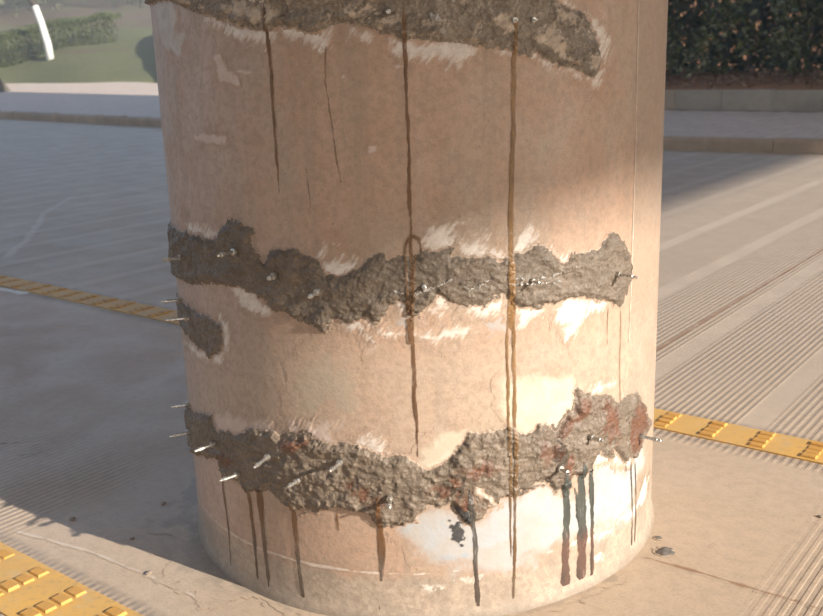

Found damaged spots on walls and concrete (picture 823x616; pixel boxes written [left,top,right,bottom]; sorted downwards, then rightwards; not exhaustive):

peeling [219,0,287,31]
peeling [317,0,385,30]
peeling [406,23,482,48]
peeling [486,0,601,77]
corrosion [262,3,280,192]
corrosion [402,8,422,457]
corrosion [506,13,519,599]
corrosion [243,487,270,587]
corrosion [288,500,305,598]
corrosion [375,498,386,581]
spalling [473,487,499,508]